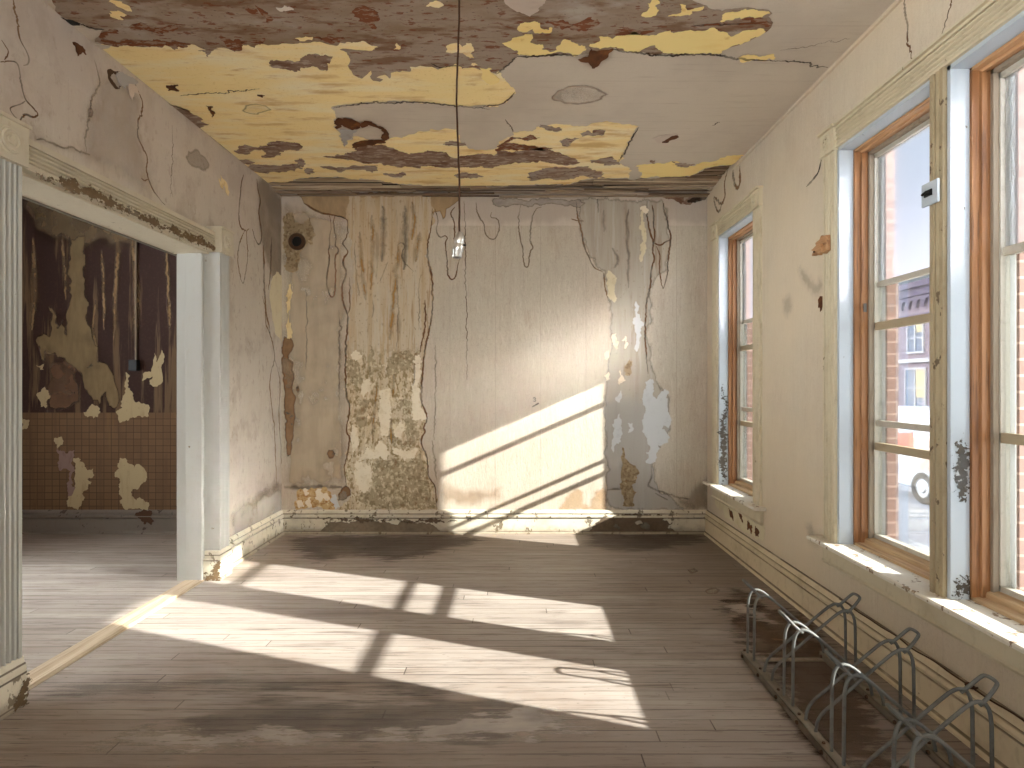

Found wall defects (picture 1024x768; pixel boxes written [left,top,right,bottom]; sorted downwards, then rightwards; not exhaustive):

crack [0,0,78,151]
flaking render [502,9,775,63]
flaking render [641,0,704,18]
crack [903,0,912,59]
crack [135,84,165,205]
peeling [34,168,215,251]
leakage [298,190,398,298]
flaking render [100,42,744,532]
leakage [431,192,462,280]
crack [644,197,707,371]
peeling [952,439,970,503]
peeling [952,575,970,600]